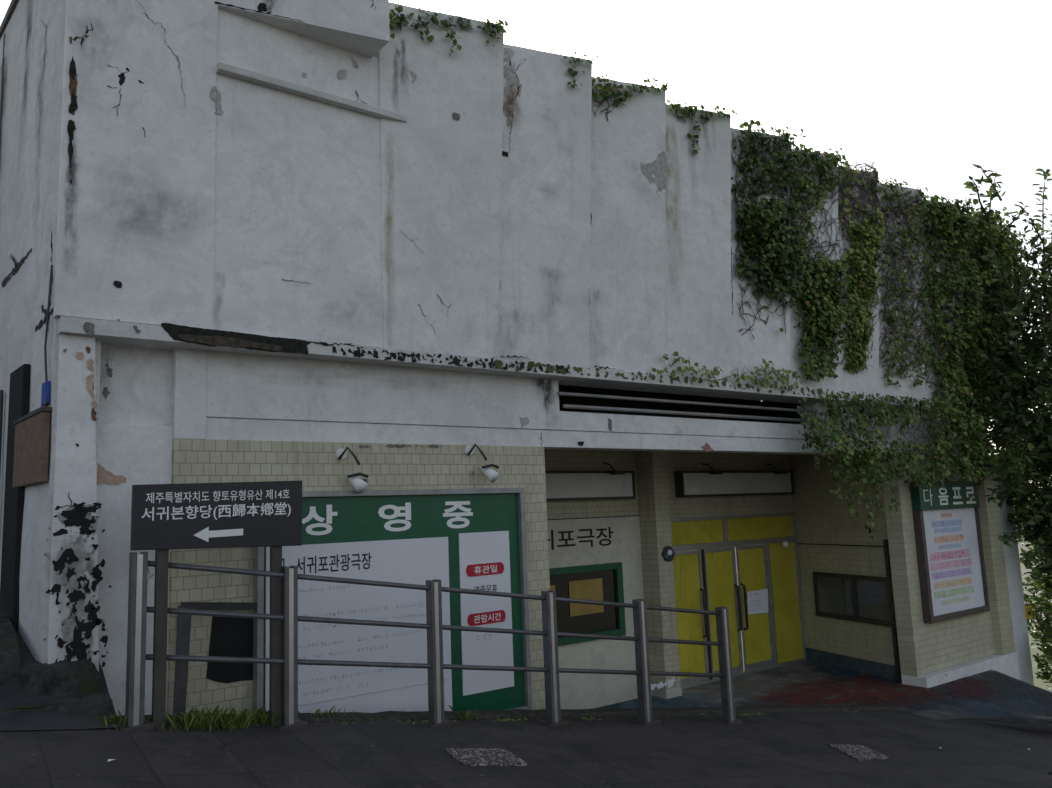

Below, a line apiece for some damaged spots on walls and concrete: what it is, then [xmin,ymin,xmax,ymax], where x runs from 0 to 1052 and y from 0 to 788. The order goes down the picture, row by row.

crack [73,24,93,51]
crack [136,0,186,109]
crack [509,60,522,152]
peeling [640,151,667,196]
peeling [63,318,112,421]
spalling [161,323,309,355]
peeling [97,463,127,485]
peeling [44,502,114,667]